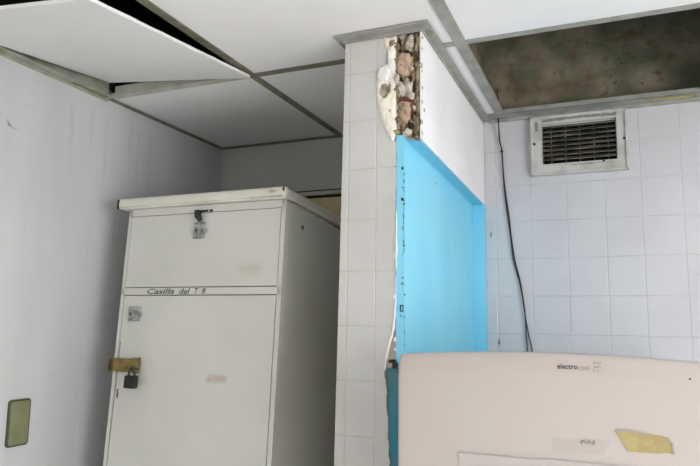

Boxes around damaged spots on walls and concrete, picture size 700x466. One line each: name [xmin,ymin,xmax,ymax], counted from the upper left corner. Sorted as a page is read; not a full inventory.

spalling [376,32,425,141]